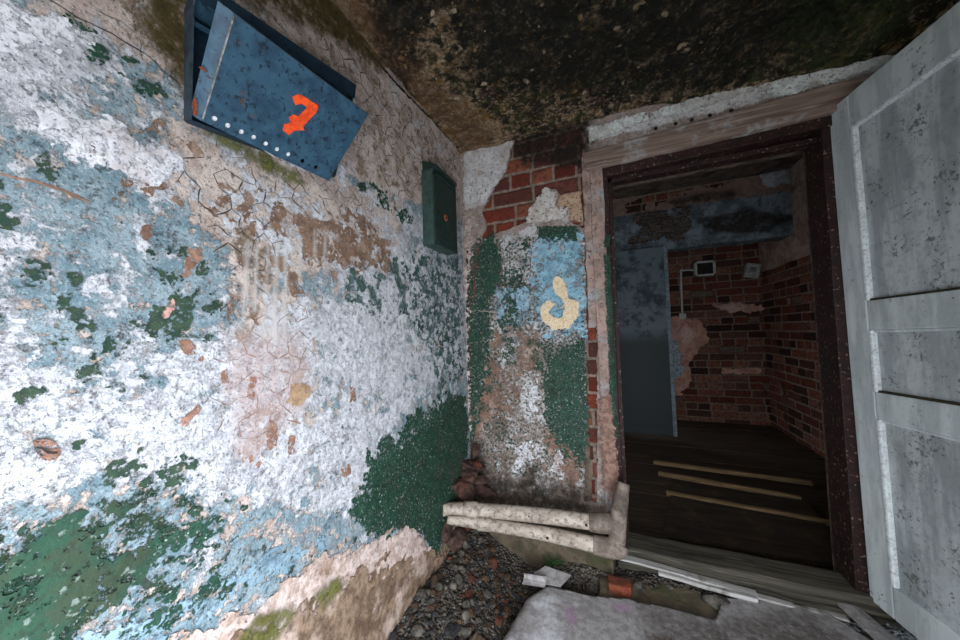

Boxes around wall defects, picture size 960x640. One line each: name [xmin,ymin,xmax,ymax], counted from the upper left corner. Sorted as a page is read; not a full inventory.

peeling [0,2,168,100]
peeling [417,4,488,100]
damp [249,0,917,150]
peeling [677,27,720,72]
peeling [588,55,891,142]
peeling [28,101,202,207]
flaking render [625,178,740,249]
crack [178,141,373,449]
peeling [0,126,619,640]